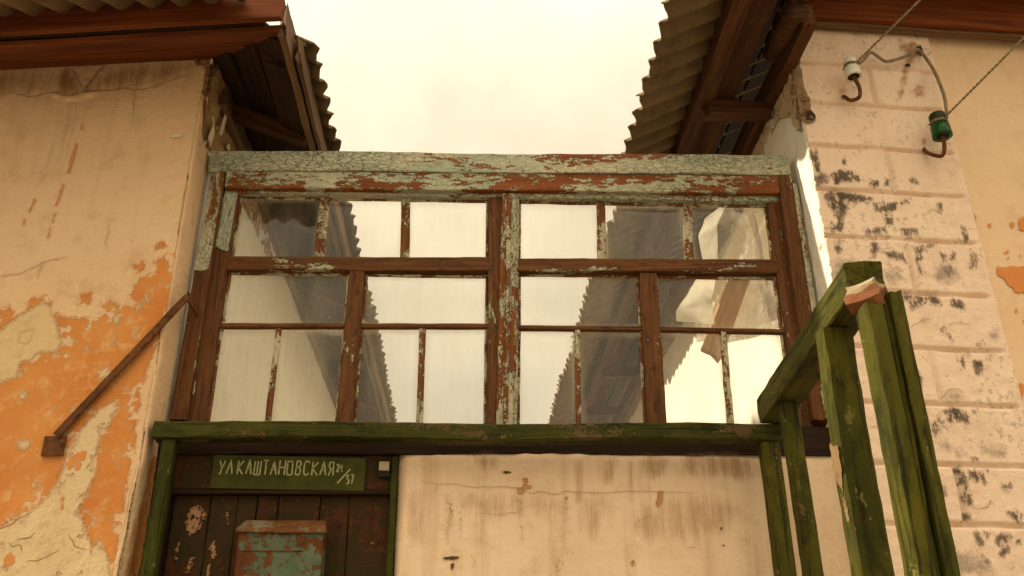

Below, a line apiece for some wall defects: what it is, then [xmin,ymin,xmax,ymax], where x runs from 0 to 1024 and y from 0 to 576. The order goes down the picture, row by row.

spalling [194,58,235,151]
spalling [751,61,816,155]
spalling [243,199,273,257]
peeling [997,250,1024,293]
peeling [0,242,176,576]
crack [423,481,690,527]